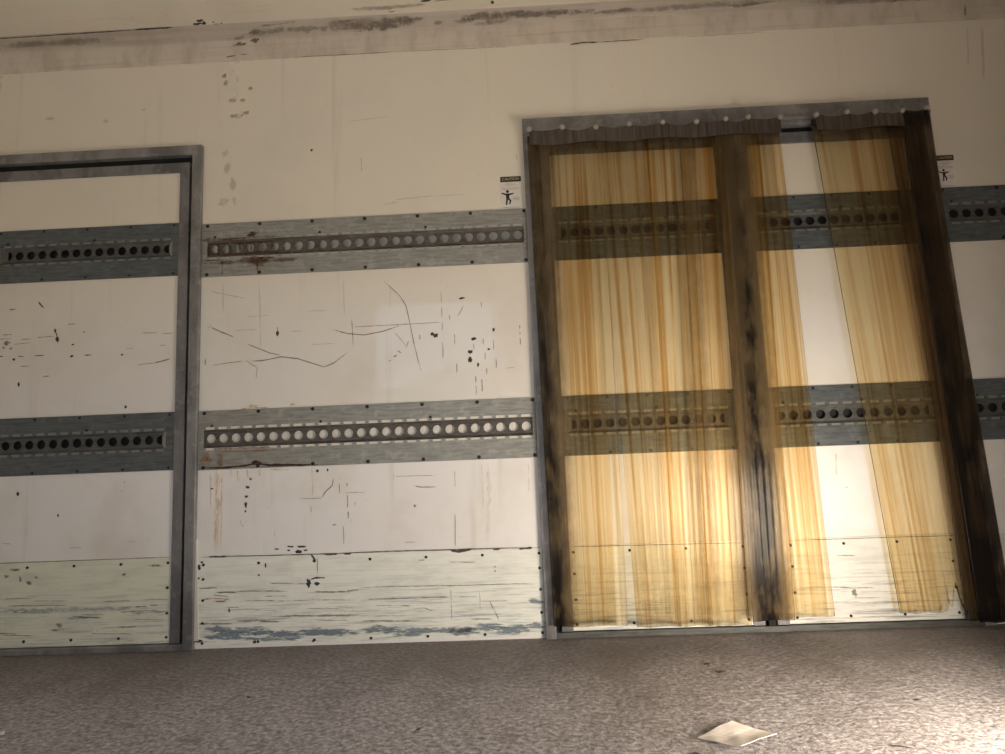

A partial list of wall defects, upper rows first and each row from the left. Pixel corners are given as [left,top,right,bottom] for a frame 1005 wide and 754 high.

rust [203,232,295,274]